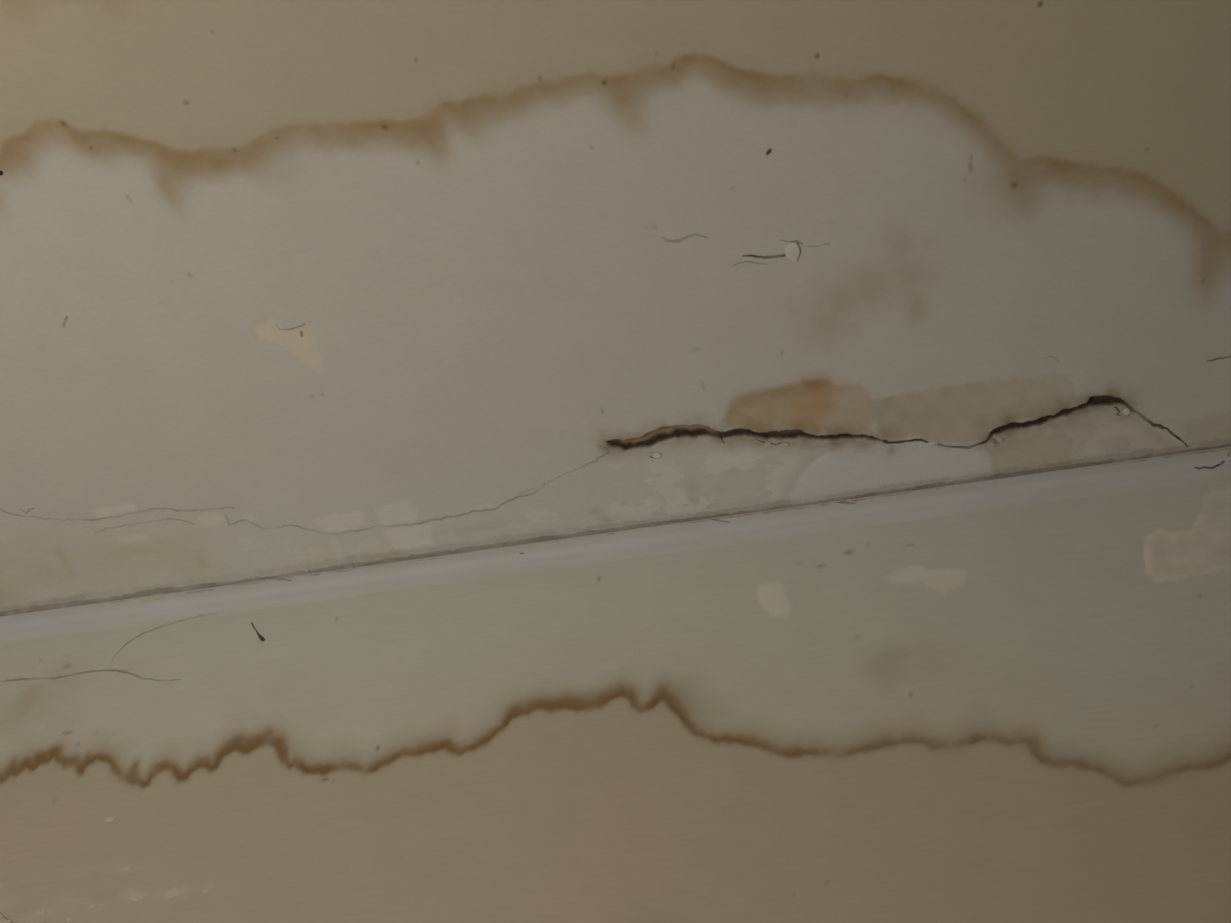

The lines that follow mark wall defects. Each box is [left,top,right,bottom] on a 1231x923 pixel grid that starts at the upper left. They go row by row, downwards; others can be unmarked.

damp [0,40,1231,600]
crack [584,374,1230,469]
damp [0,478,1231,795]